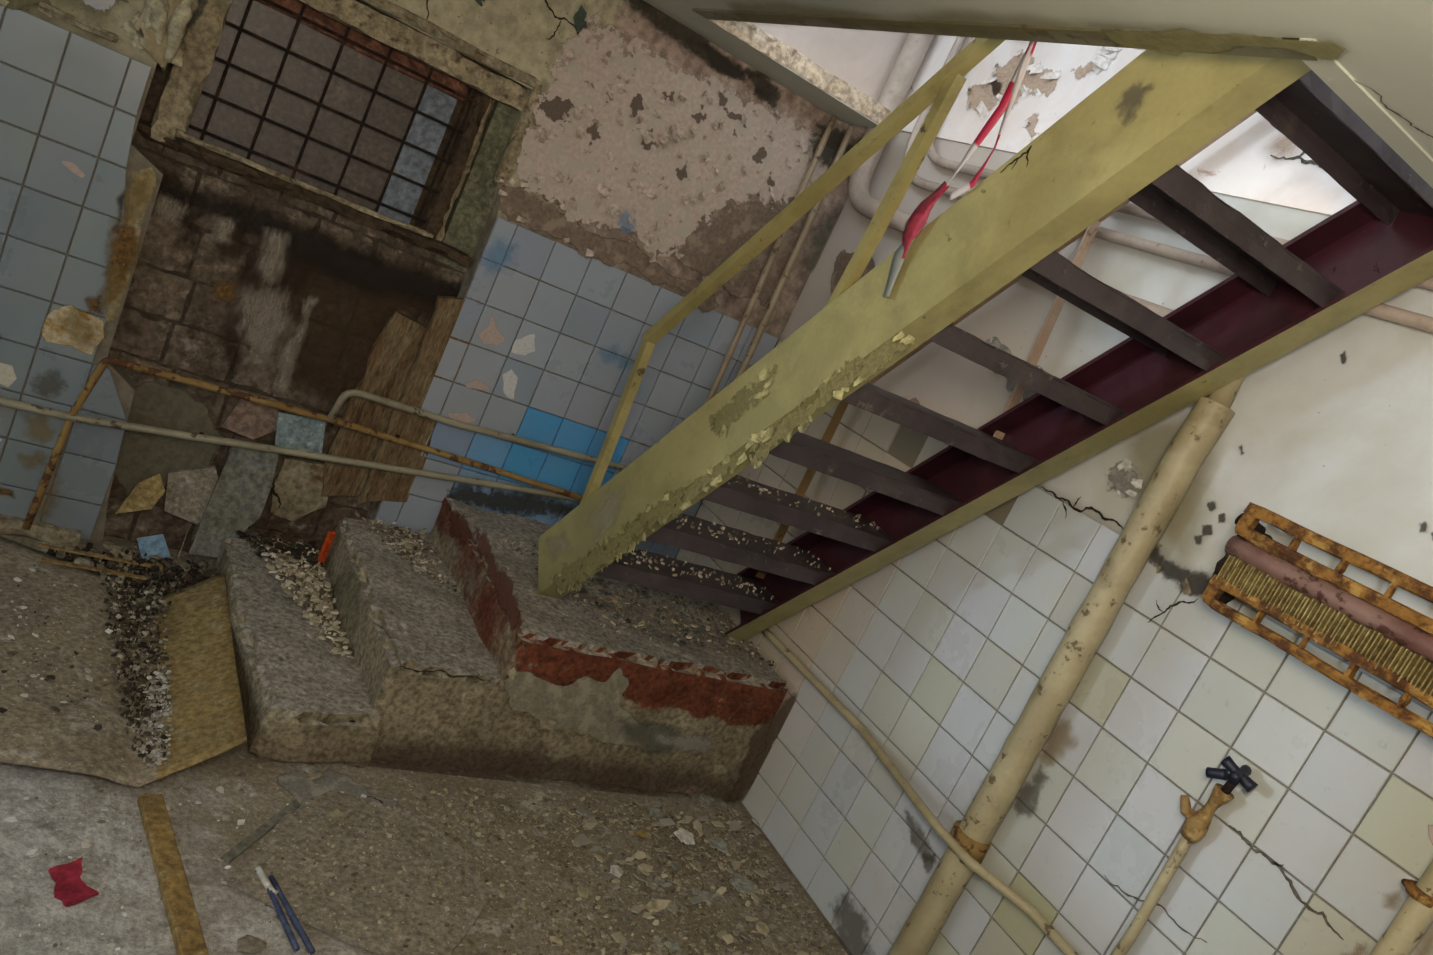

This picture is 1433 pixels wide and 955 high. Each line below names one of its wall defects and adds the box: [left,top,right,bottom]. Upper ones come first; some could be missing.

crack [545,0,579,40]
peeling [965,29,1345,142]
crack [1348,74,1433,138]
peeling [498,5,832,313]
flaking render [114,381,224,507]
spalling [275,412,326,453]
spalling [137,534,170,560]
peeling [448,507,524,630]
crack [1041,486,1123,529]
crack [1148,599,1197,623]
spalling [504,667,711,752]
crack [1229,825,1344,940]